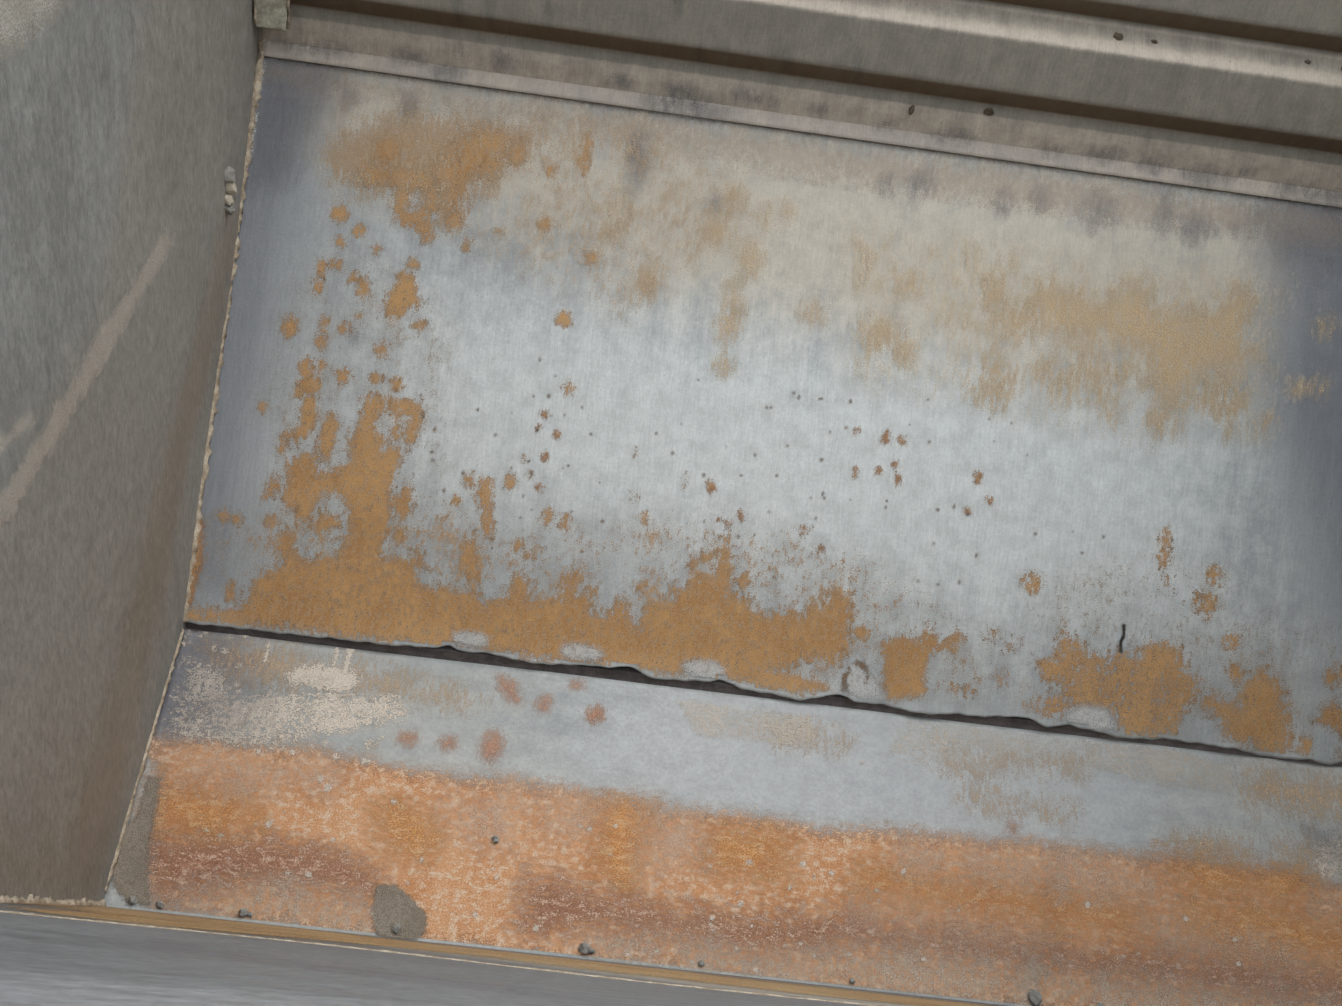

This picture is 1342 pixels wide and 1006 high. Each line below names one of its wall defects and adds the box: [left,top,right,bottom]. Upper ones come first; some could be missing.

corrosion [187,103,1023,716]
peeling [452,630,488,647]
peeling [560,642,605,661]
peeling [682,658,725,678]
peeling [841,658,882,700]
corrosion [1019,527,1342,762]
corrosion [0,730,1342,1006]